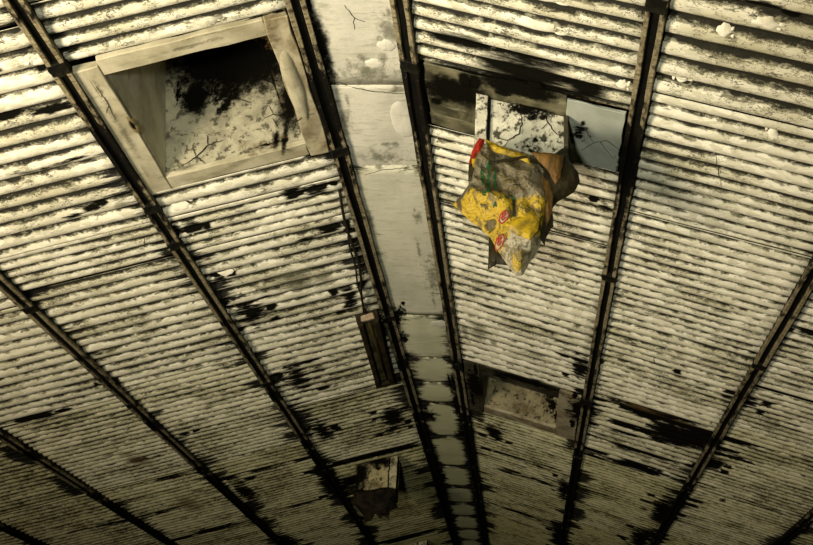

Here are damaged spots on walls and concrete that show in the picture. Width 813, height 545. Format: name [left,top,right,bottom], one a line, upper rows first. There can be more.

water stain [166,35,298,154]
water stain [422,31,606,122]
water stain [204,268,236,282]
water stain [221,292,281,331]
water stain [328,280,368,315]
water stain [268,358,330,393]
water stain [447,371,464,436]
water stain [488,350,712,482]
water stain [742,396,774,416]
water stain [475,418,581,506]
water stain [704,436,769,477]
water stain [615,489,703,545]